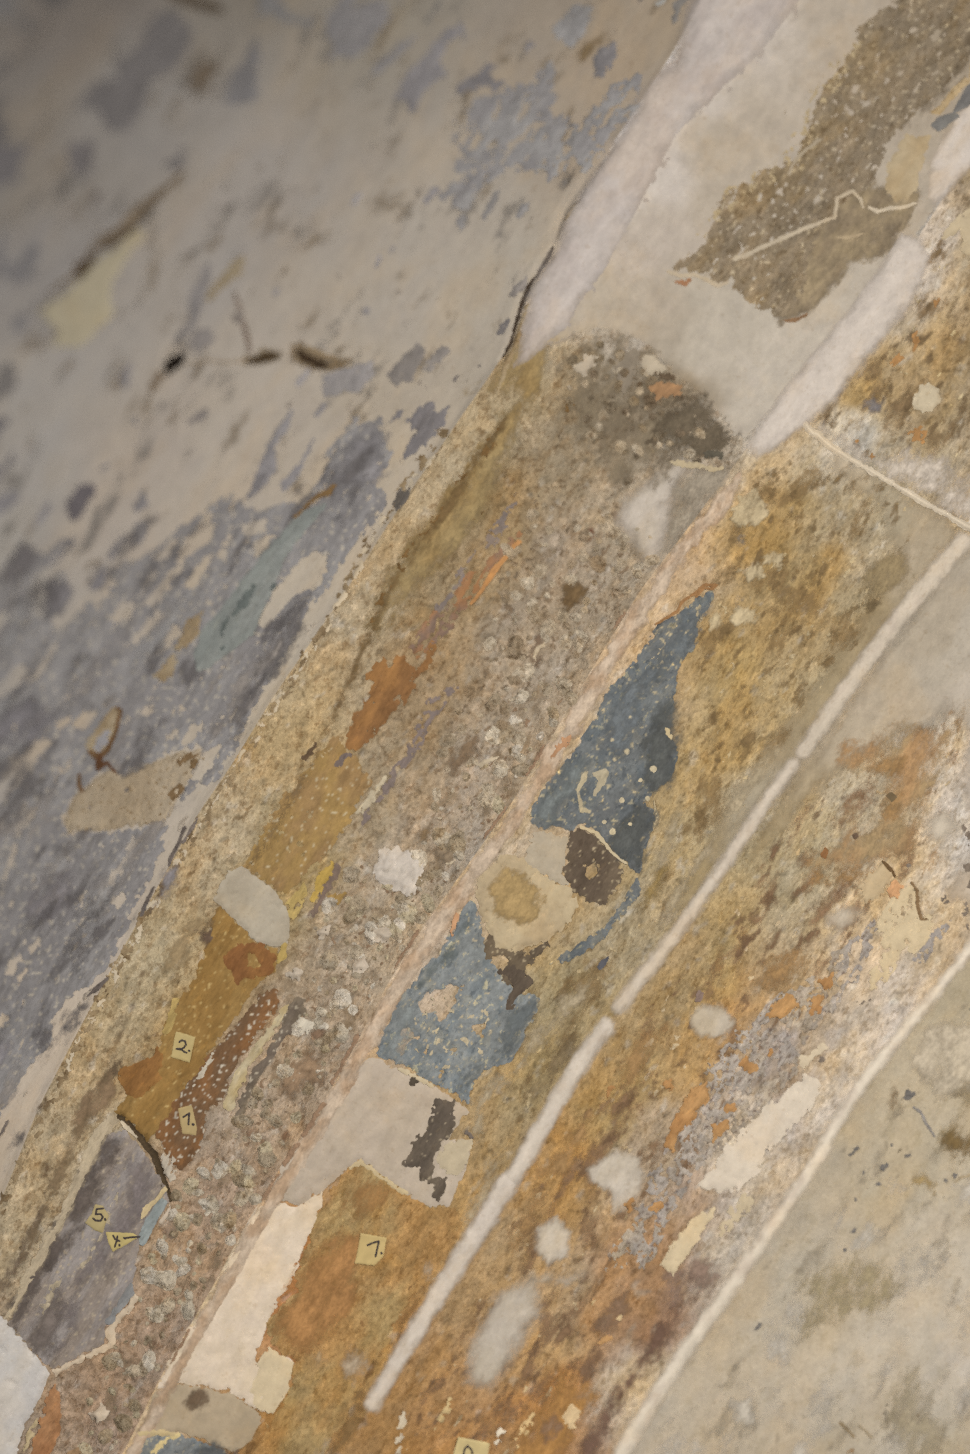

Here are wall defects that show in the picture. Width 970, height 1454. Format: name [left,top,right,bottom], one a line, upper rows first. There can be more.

crack [495,198,581,396]
peeling [570,339,731,484]
crack [667,189,917,288]
crack [784,313,808,322]
crack [788,138,822,176]
water stain [928,230,948,269]
water stain [334,344,546,826]
peeling [0,401,450,1117]
peeling [376,590,714,1202]
crack [117,1114,172,1202]
peeling [4,906,314,1377]
peeling [605,860,952,1277]